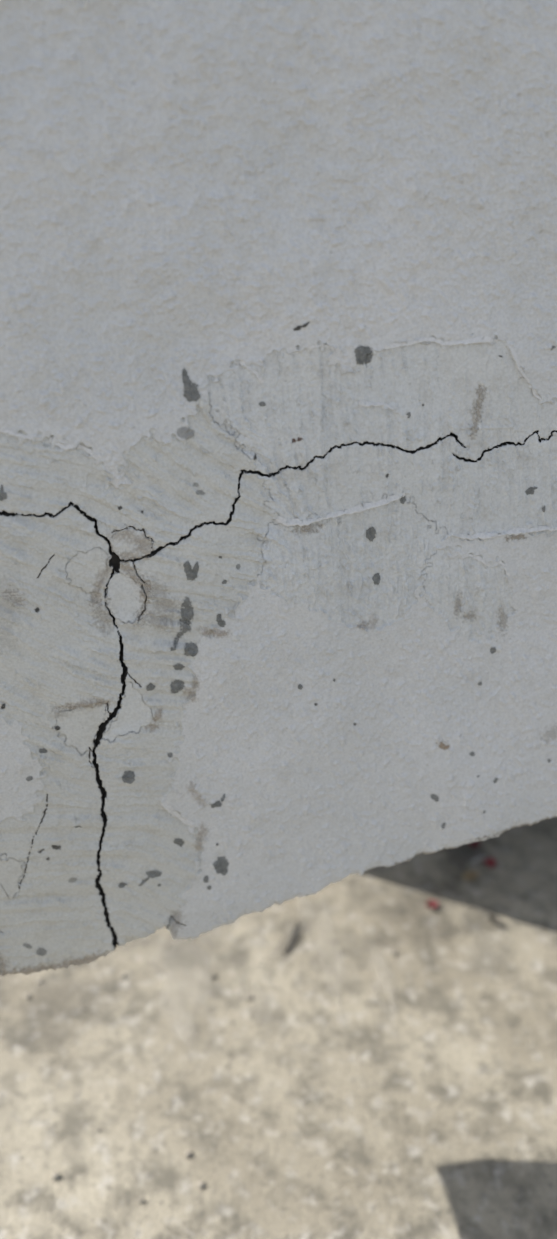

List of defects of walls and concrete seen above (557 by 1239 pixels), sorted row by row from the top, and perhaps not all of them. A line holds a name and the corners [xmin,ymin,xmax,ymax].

crack [0,430,557,949]